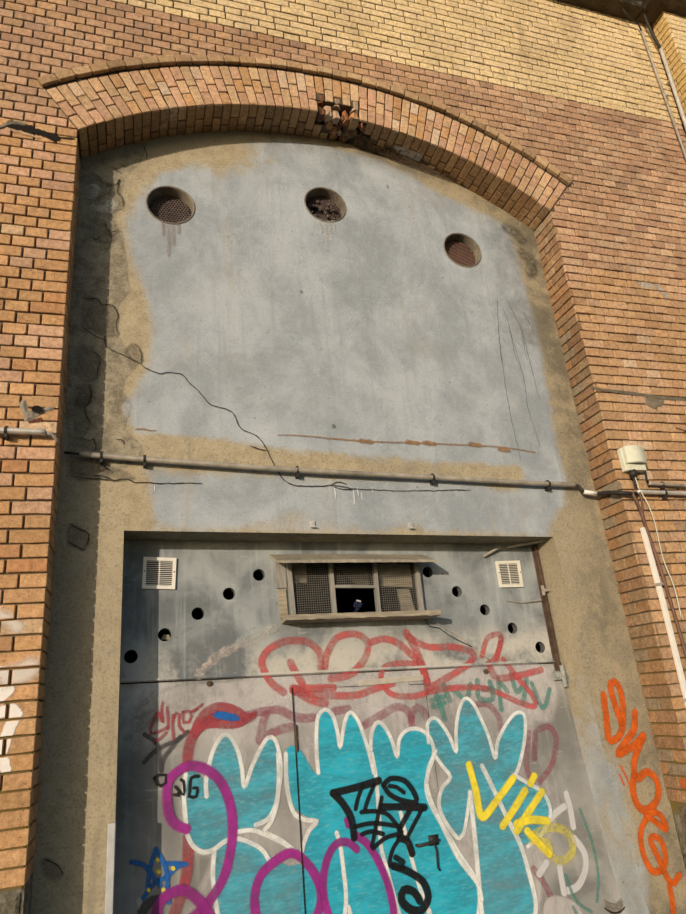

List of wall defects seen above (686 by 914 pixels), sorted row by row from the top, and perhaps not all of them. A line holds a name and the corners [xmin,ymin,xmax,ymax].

spalling [316,95,366,145]
crack [77,327,459,491]
corrosion [280,434,536,453]